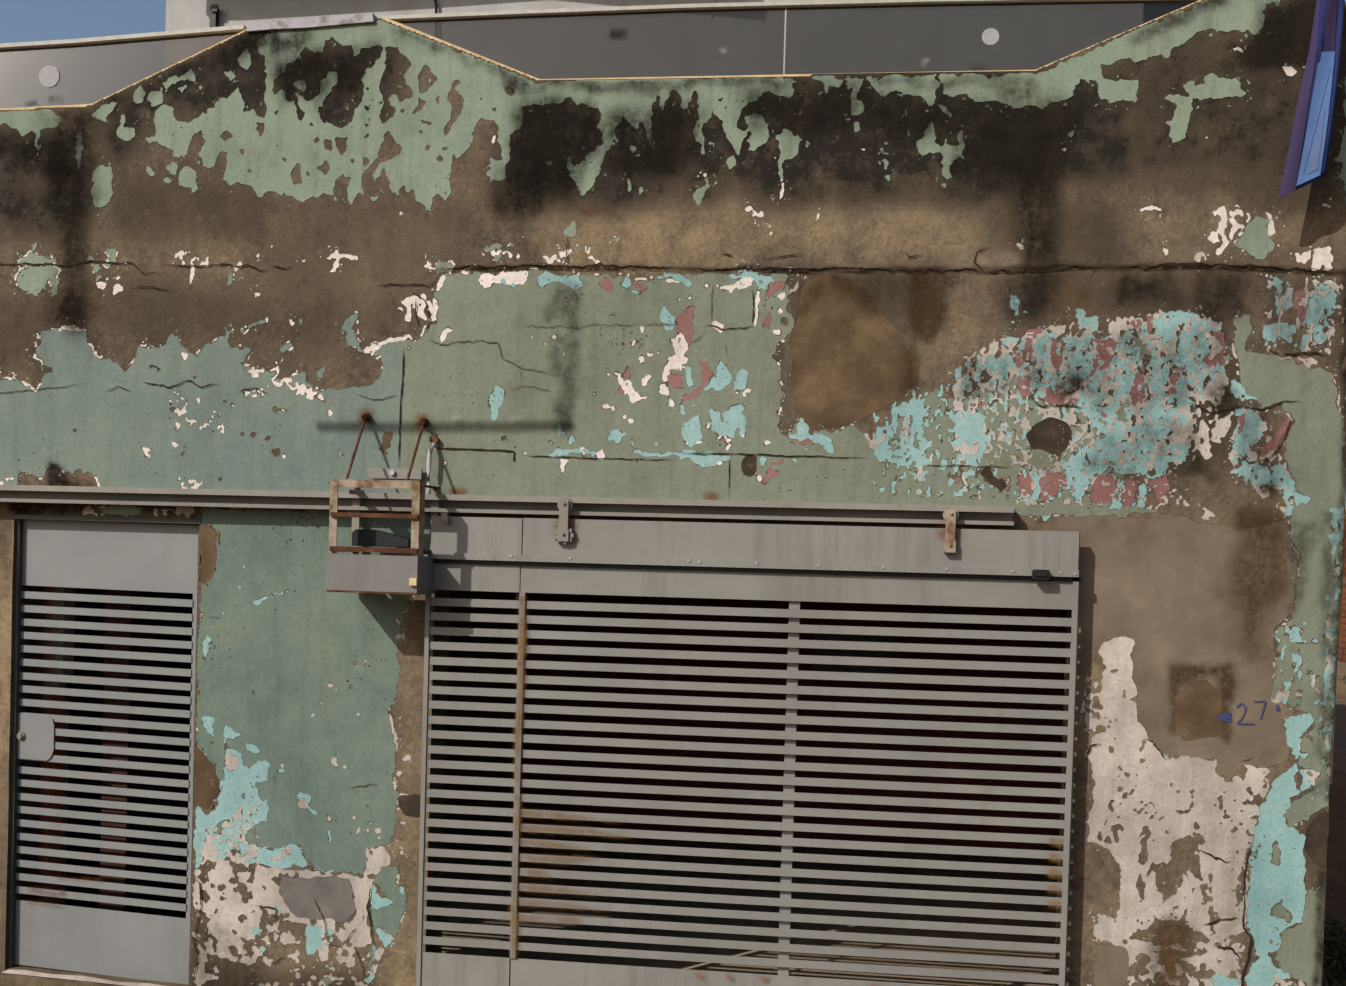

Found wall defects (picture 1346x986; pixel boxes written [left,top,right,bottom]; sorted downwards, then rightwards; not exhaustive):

water stain [220,31,356,97]
water stain [495,78,700,215]
water stain [868,83,1075,316]
peeling [812,0,1299,188]
water stain [1239,0,1317,68]
peeling [1279,63,1305,82]
peeling [1322,76,1346,208]
crack [0,260,294,291]
crack [356,237,1341,468]
crack [524,452,864,486]
peeling [0,204,1346,986]
corrosion [515,620,525,749]